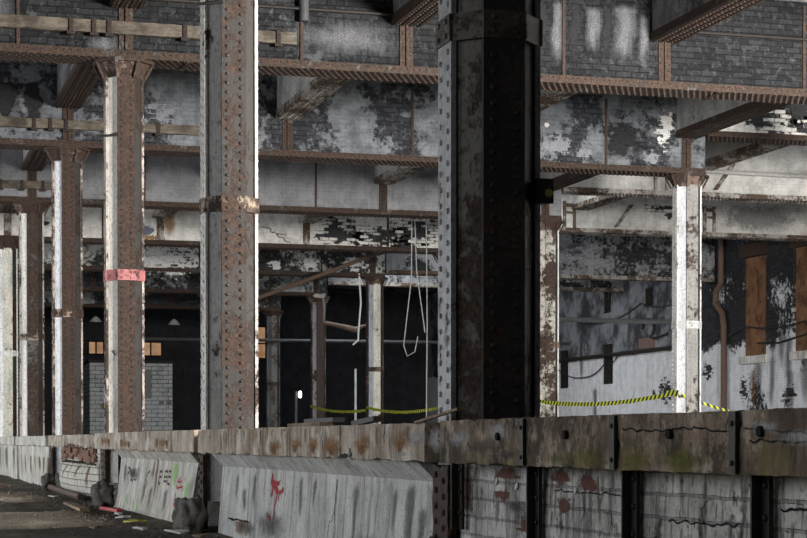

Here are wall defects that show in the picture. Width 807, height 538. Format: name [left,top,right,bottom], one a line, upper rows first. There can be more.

water stain [540,2,648,63]
peeling [745,104,807,140]
peeling [314,216,438,253]
peeling [298,254,323,271]
peeling [341,256,369,272]
crack [622,426,807,444]
crack [668,498,740,528]
crack [781,506,807,514]